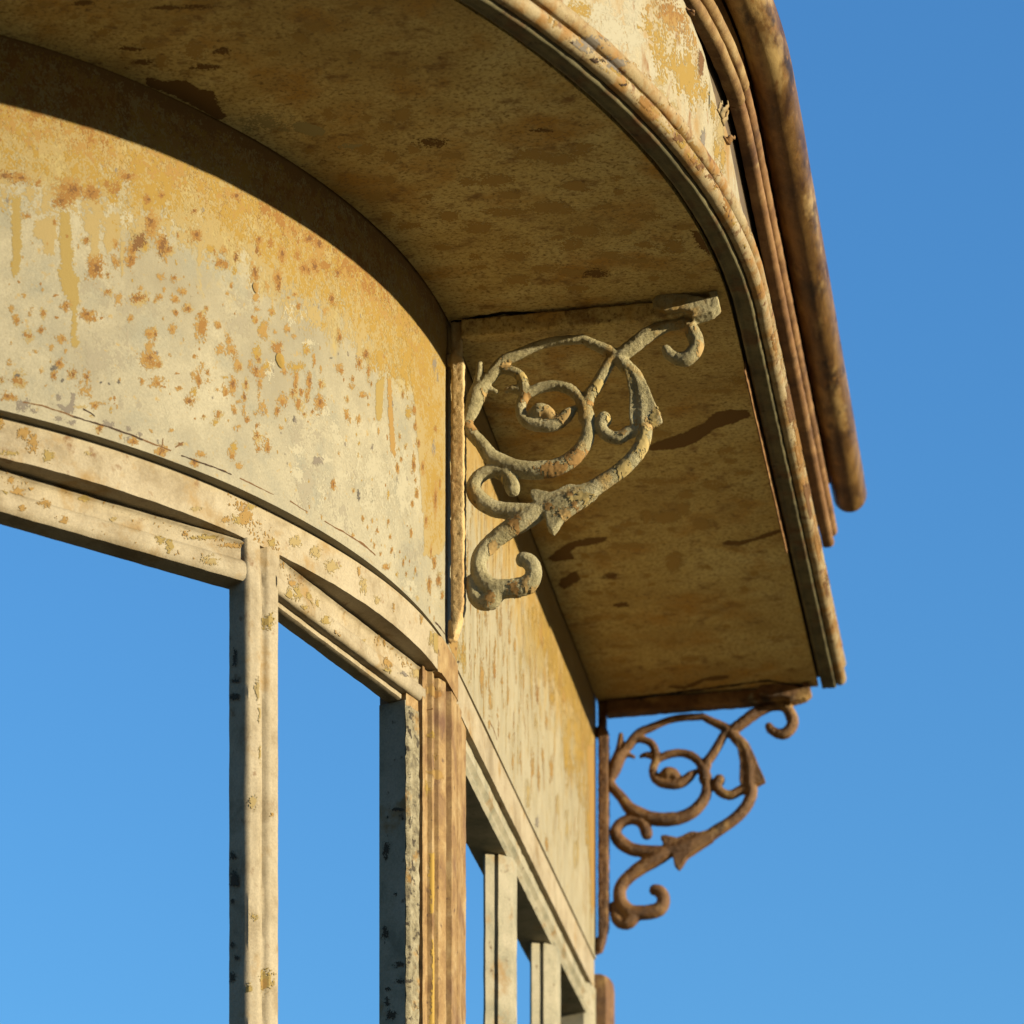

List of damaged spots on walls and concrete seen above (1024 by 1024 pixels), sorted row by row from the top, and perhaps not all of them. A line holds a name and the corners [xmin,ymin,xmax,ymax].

damp [0,38,447,558]
corrosion [498,357,576,428]
corrosion [587,374,604,408]
peeling [284,397,415,545]
corrosion [533,447,589,479]
corrosion [613,408,755,481]
corrosion [543,487,620,596]